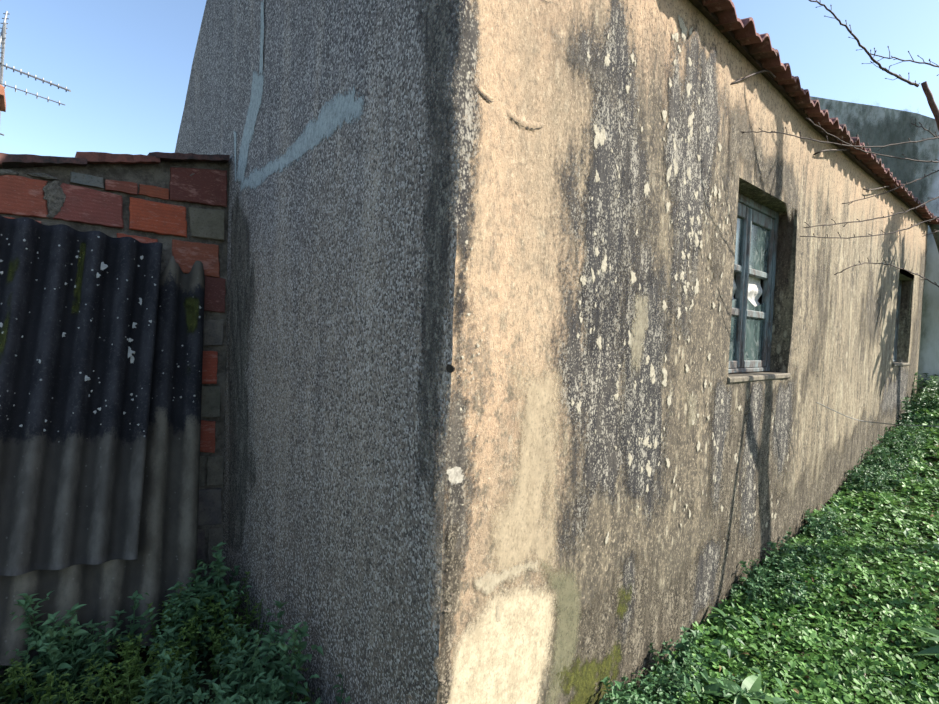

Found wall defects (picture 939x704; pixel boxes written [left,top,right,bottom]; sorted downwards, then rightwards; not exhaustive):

leakage [416,0,488,624]
flaking render [435,365,580,704]
leakage [551,0,798,570]
leakage [570,207,928,704]